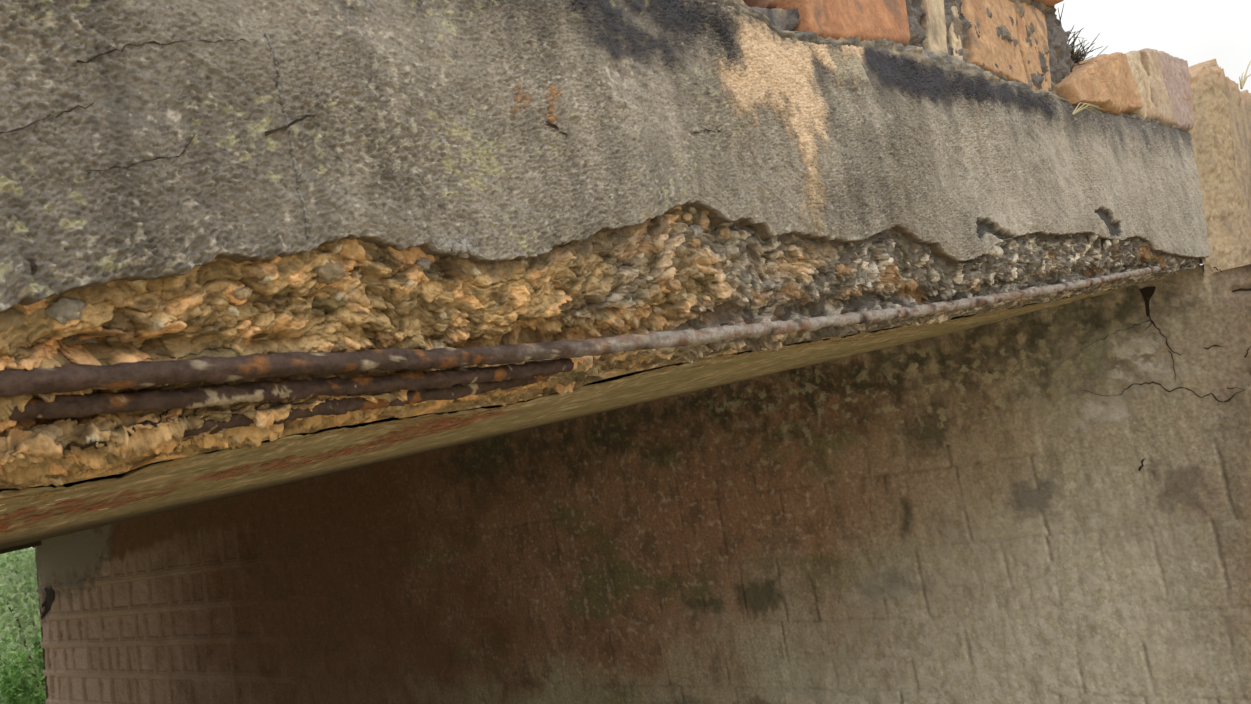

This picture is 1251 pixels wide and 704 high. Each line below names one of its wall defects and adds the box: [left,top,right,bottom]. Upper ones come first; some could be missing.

spalling [0,205,1203,511]
crack [1078,310,1251,402]
water stain [822,481,1192,704]